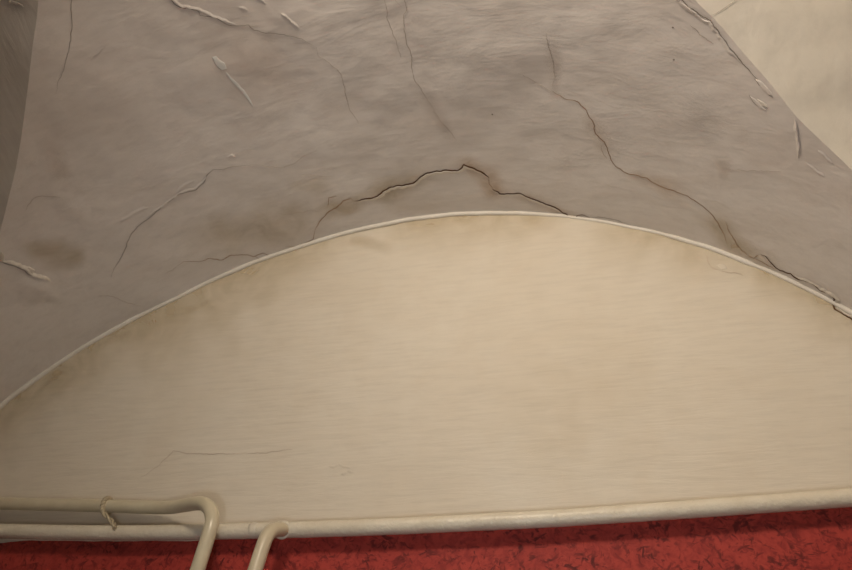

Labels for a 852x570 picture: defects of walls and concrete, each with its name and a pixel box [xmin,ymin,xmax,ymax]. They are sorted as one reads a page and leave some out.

crack [171,0,359,124]
crack [676,0,758,80]
crack [112,152,313,273]
crack [279,164,625,247]
crack [523,38,852,320]